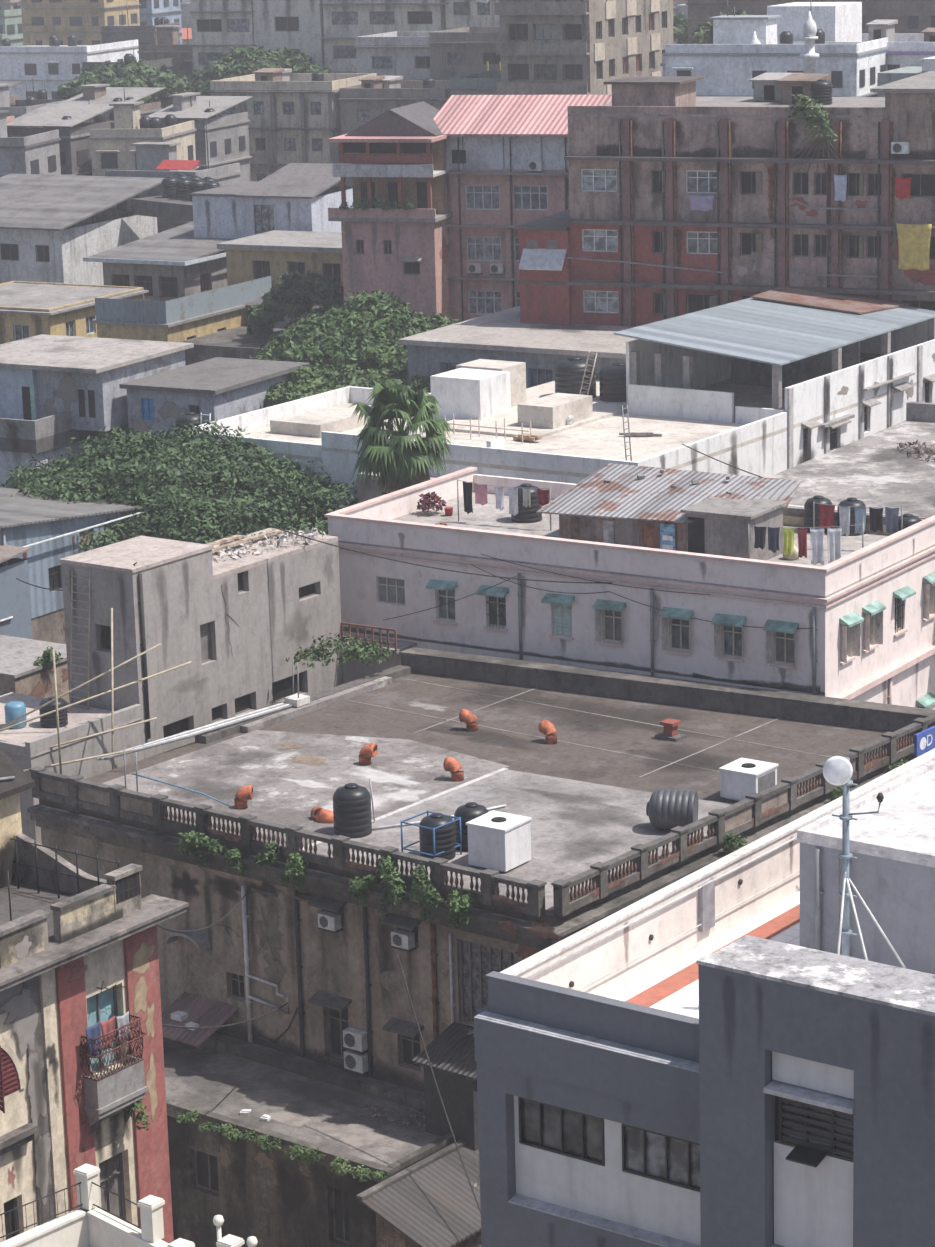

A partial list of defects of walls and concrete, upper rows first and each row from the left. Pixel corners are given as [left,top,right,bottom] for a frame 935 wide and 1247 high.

damp [596,121,866,159]
damp [893,151,935,159]
damp [173,873,198,895]
damp [213,876,276,900]
flaking render [14,935,32,959]
peeling [132,941,157,1121]
damp [164,1061,235,1090]
peeling [0,982,51,1205]